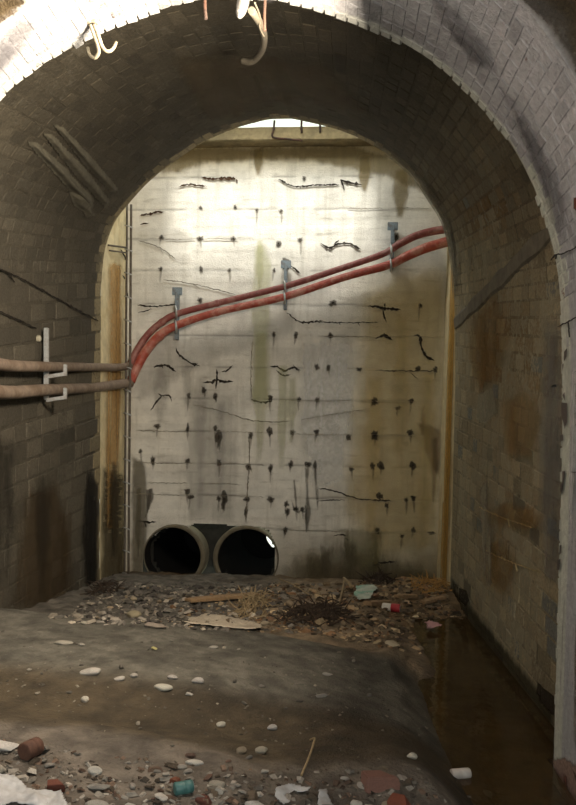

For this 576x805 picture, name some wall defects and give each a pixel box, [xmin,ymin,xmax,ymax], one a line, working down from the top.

crack [180,176,238,187]
crack [278,179,429,210]
water stain [359,157,370,189]
crack [140,211,187,260]
crack [321,240,361,250]
water stain [391,156,456,287]
crack [121,250,175,313]
crack [163,279,235,295]
crack [287,304,438,378]
crack [133,341,429,516]
water stain [293,468,318,524]
spalling [553,758,576,800]